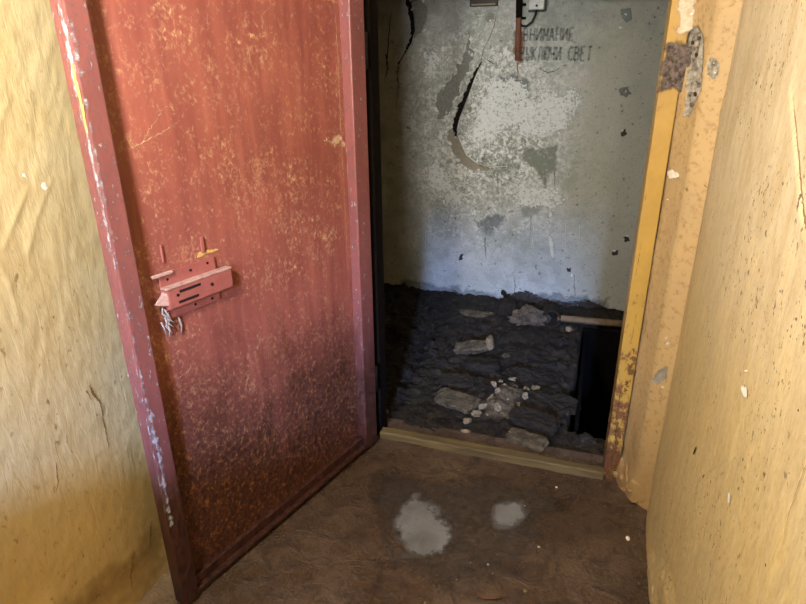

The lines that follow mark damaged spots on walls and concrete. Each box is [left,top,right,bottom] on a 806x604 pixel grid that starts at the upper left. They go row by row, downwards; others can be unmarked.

peeling [434,36,474,120]
crack [452,17,499,137]
spalling [677,0,719,117]
spalling [447,130,507,171]